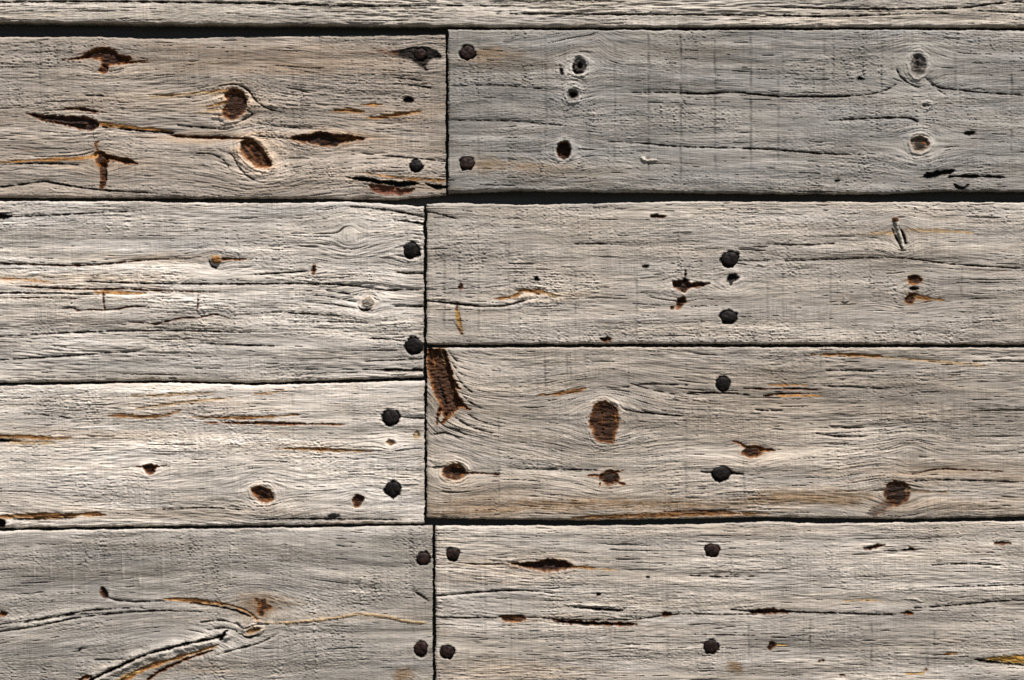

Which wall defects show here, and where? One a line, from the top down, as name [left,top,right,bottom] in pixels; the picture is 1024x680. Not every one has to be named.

crack [0,162,147,217]
crack [404,356,492,439]
crack [0,597,274,680]